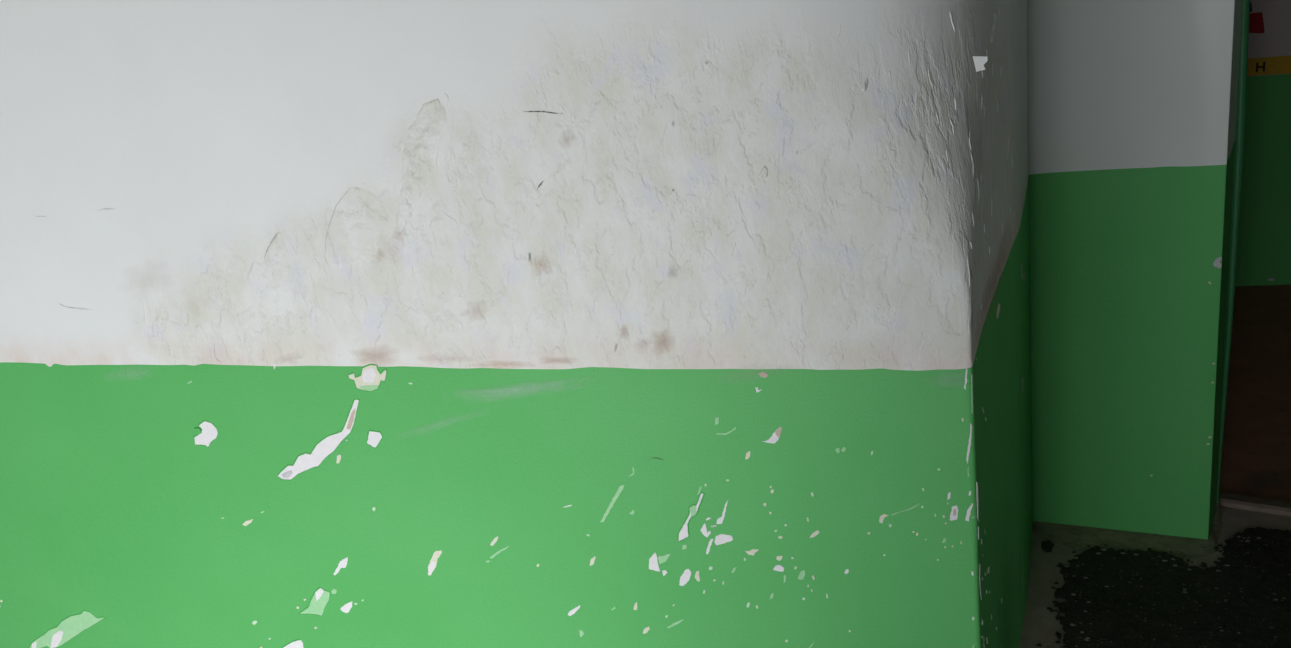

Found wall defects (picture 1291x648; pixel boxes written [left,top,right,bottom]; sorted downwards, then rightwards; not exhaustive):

peeling [973,50,988,78]
peeling [193,420,219,448]
peeling [277,364,388,481]
peeling [649,483,759,594]
peeling [296,558,364,629]
peeling [756,555,815,609]
peeling [29,610,106,648]
spalling [260,638,305,648]